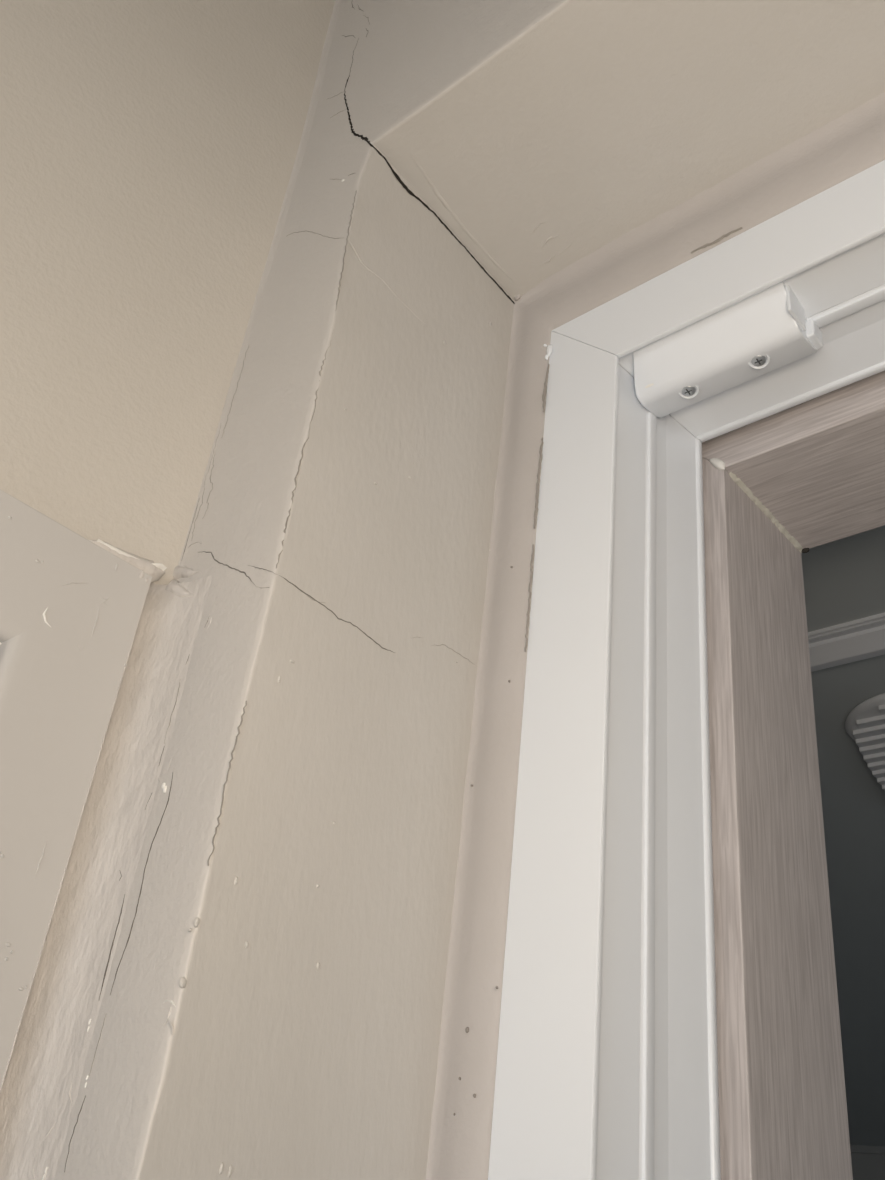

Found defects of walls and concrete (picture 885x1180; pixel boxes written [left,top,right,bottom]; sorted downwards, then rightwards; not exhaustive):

crack [328,5,521,304]
crack [181,347,473,664]
crack [64,679,181,1172]